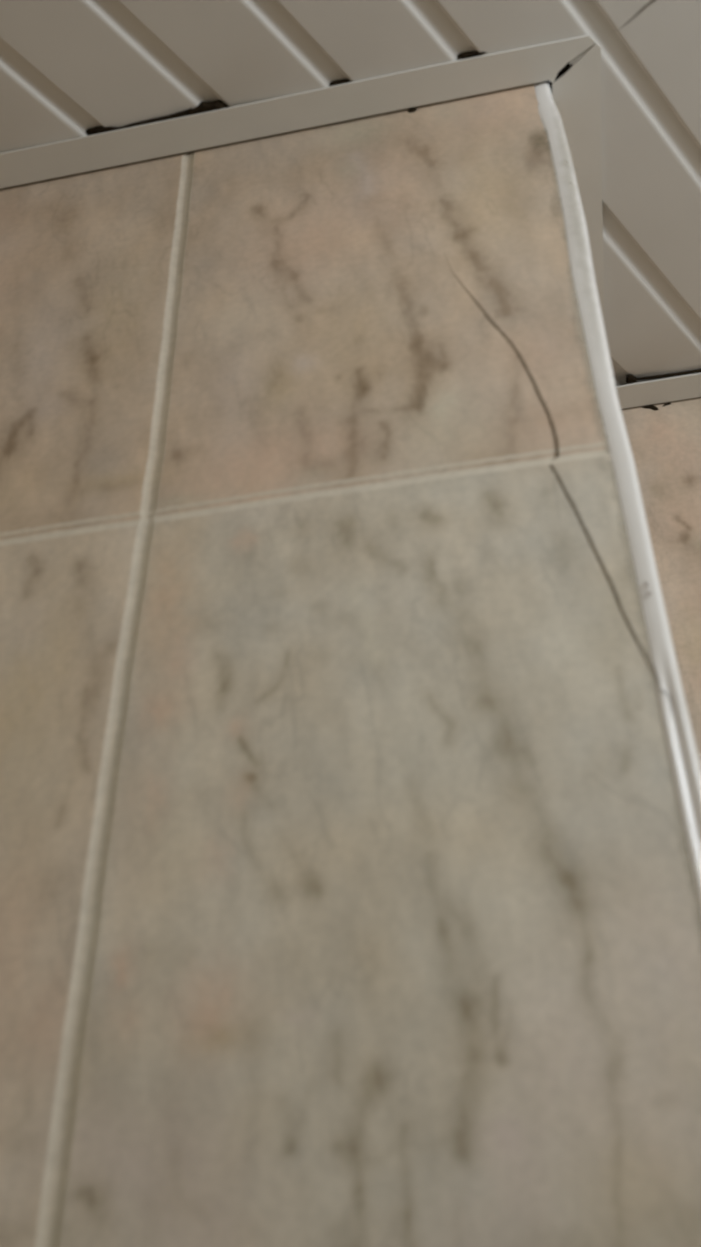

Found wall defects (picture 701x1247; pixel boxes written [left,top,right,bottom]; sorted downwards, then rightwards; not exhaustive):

crack [517,352,572,501]
crack [584,528,615,593]